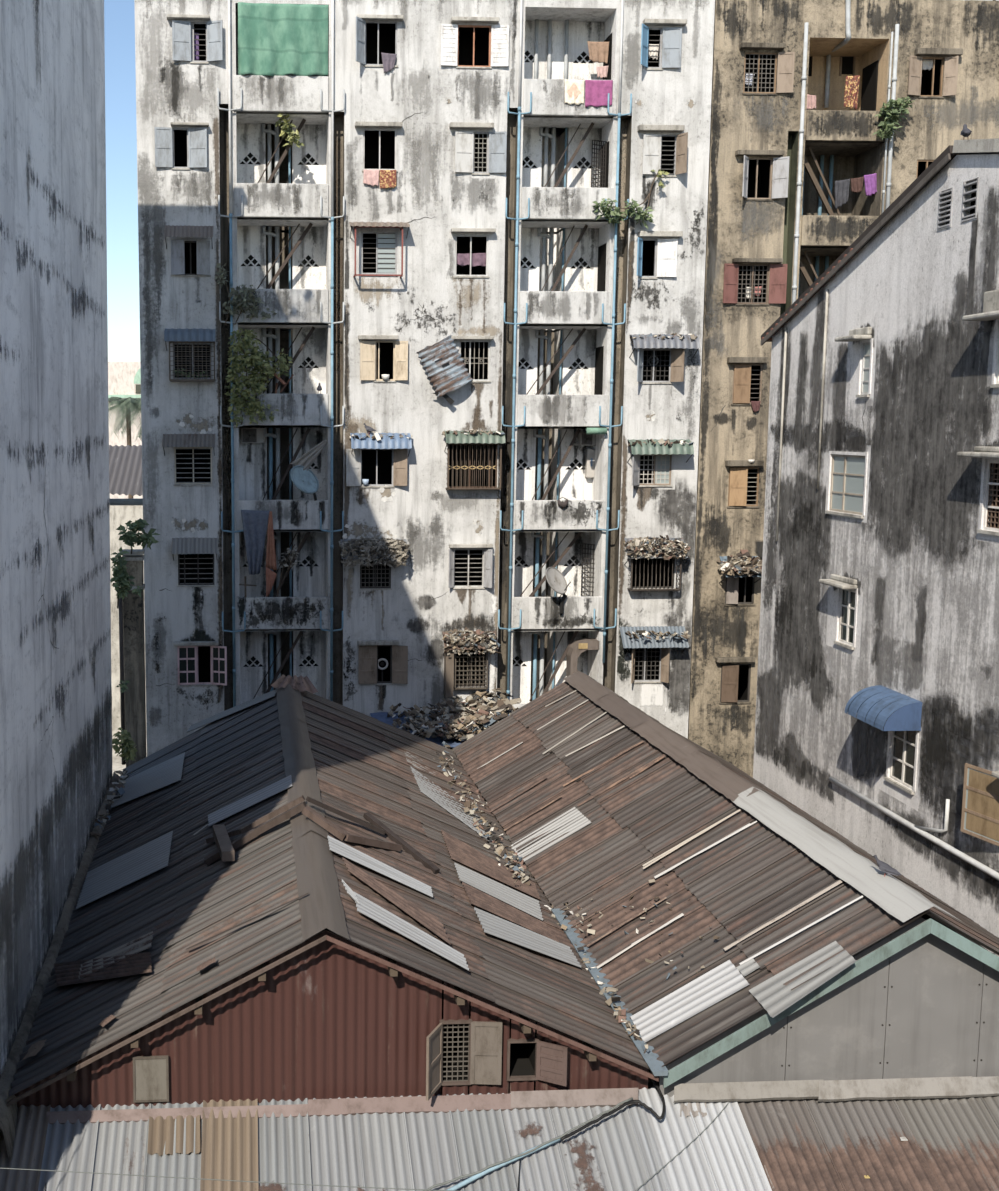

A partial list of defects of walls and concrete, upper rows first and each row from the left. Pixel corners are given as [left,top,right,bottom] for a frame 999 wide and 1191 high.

leakage [716,0,803,41]
leakage [212,118,245,646]
leakage [246,443,265,508]
leakage [301,426,322,472]
leakage [616,59,999,802]
leakage [276,491,325,582]
leakage [193,587,204,631]
leakage [246,537,324,695]
leakage [0,773,113,1078]
corrosion [259,1183,285,1191]
corrosion [565,1140,604,1191]